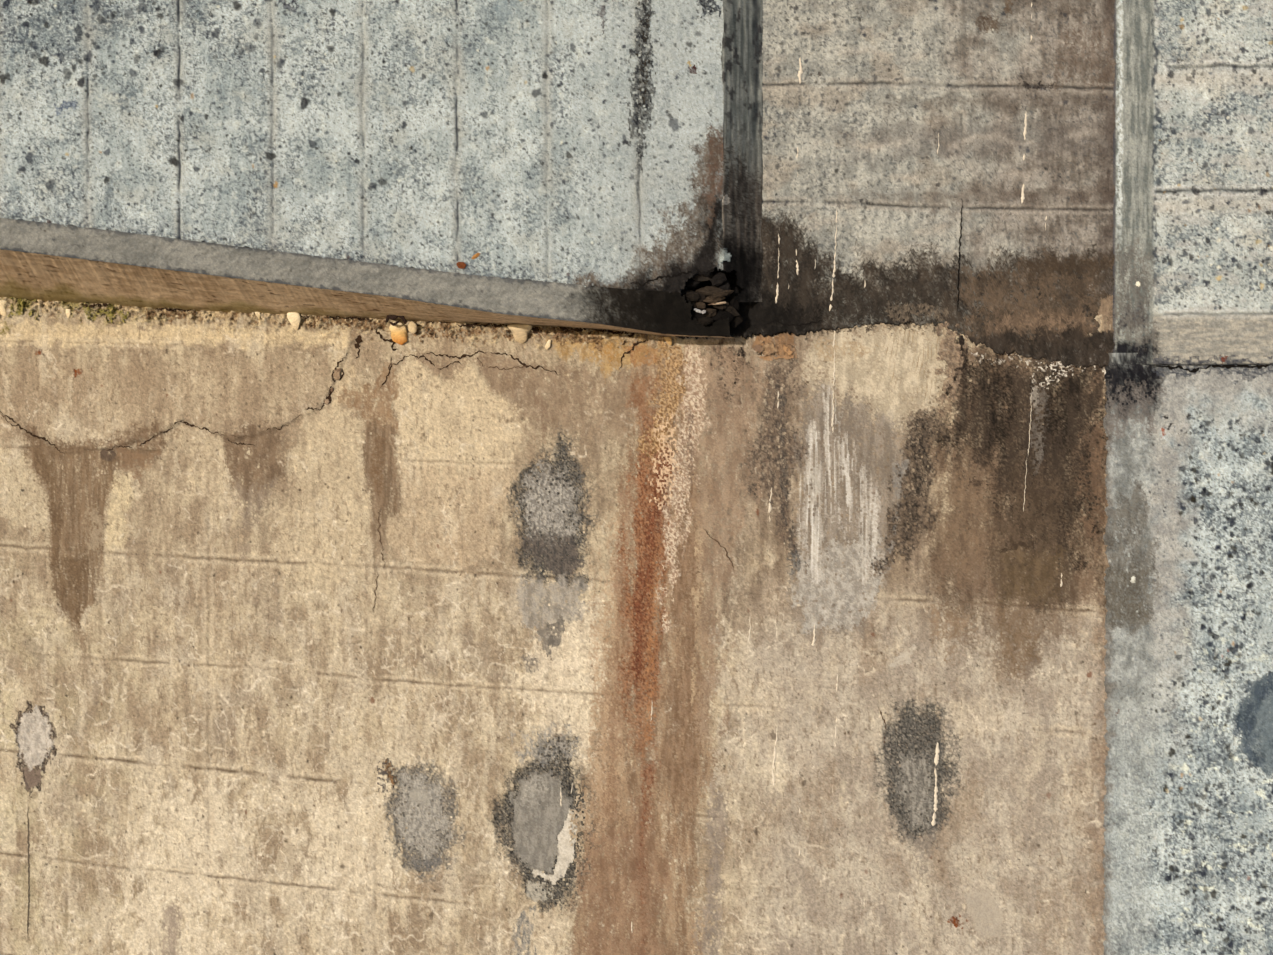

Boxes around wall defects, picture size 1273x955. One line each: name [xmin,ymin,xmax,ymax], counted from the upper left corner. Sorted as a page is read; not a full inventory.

crack [1,412,63,453]
crack [82,301,108,309]
damp [12,418,183,674]
crack [155,306,194,314]
damp [217,418,291,569]
crack [106,315,648,451]
damp [332,344,633,675]
spalling [681,271,743,328]
peeling [750,321,973,576]
damp [561,117,1273,746]
rust [546,331,724,955]
spalling [9,700,59,796]